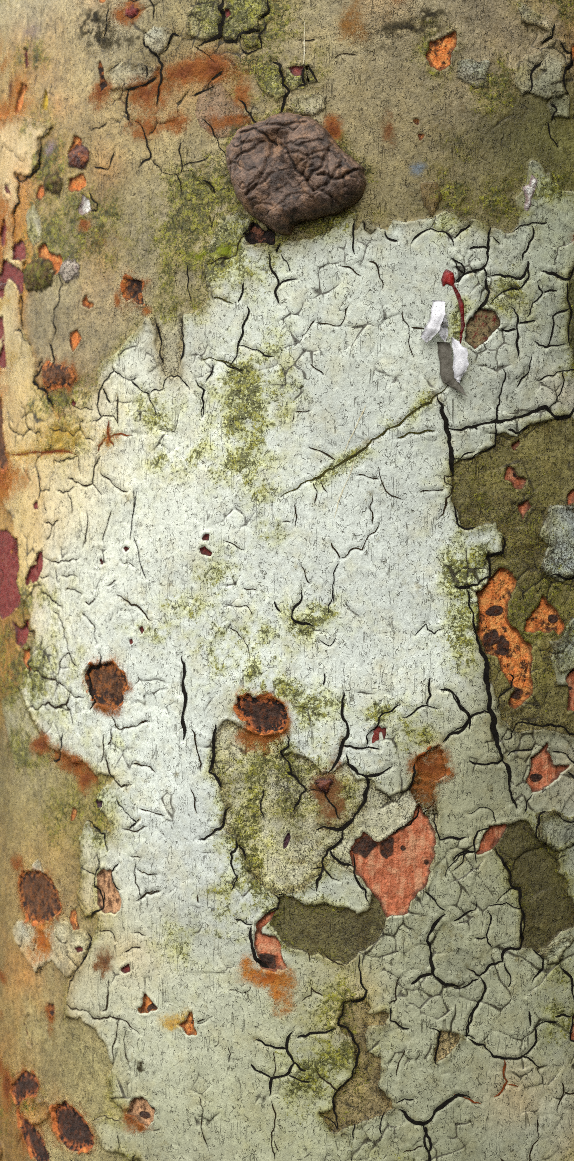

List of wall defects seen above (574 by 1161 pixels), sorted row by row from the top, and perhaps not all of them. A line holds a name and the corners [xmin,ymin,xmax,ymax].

crack [0,127,53,259]
corrosion [128,55,230,139]
crack [89,0,357,228]
corrosion [325,116,341,139]
crack [529,24,574,147]
peeling [450,415,574,792]
corrosion [85,659,132,715]
corrosion [237,726,289,751]
crack [225,221,574,1161]
corrosion [11,856,62,961]
peeling [212,693,453,972]
peeling [476,810,574,965]